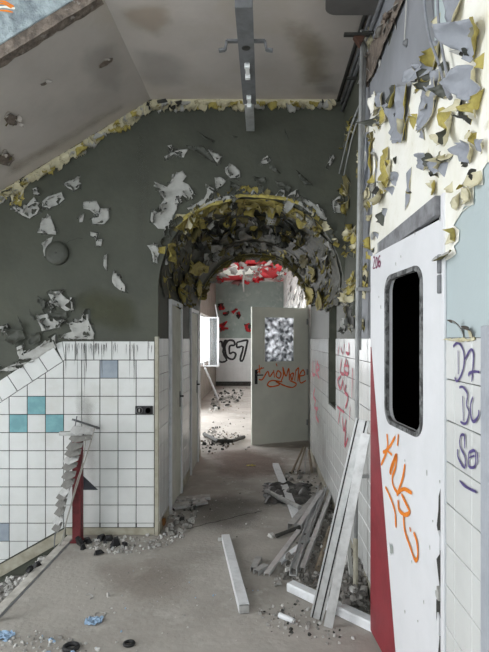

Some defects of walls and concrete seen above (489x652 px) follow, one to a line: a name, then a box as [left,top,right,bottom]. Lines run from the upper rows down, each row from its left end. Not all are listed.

peeling [77,200,129,293]
peeling [0,98,245,258]
peeling [147,0,489,335]
peeling [0,289,95,373]